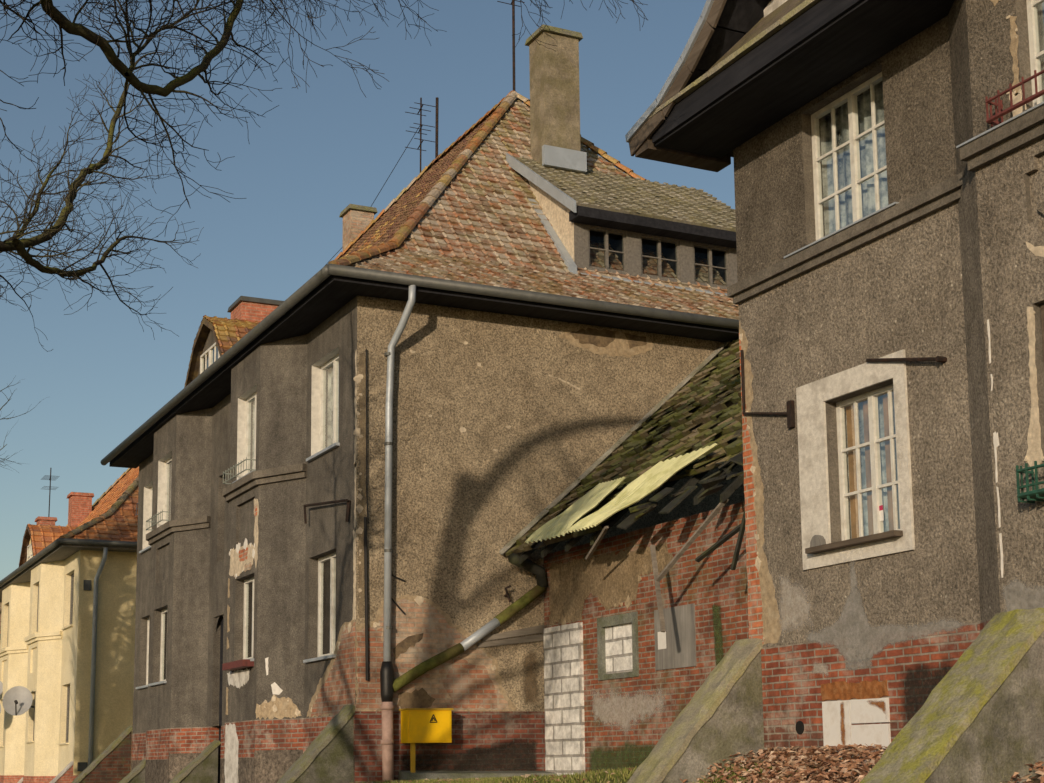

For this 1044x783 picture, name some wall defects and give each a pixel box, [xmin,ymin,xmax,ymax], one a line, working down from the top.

spalling [764,0,787,17]
flaking render [1006,15,1027,117]
flaking render [1026,242,1044,257]
flaking render [1024,307,1044,474]
flaking render [227,499,259,649]
flaking render [255,349,517,720]
peeling [224,668,250,783]
leakage [401,741,537,771]